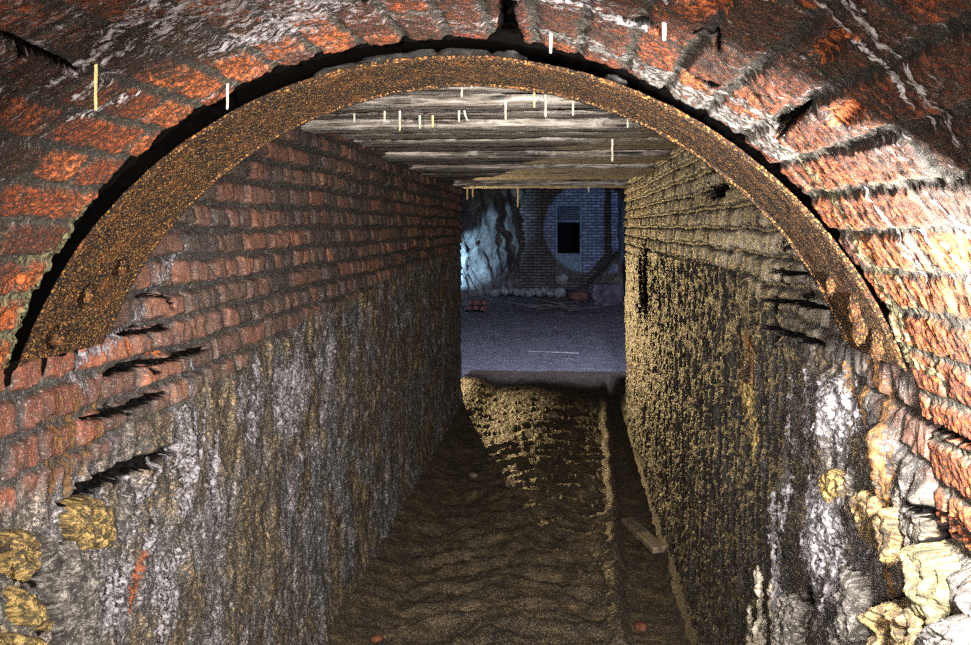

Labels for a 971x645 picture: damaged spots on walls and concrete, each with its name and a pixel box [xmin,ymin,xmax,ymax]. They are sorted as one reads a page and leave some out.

crack [0,30,103,72]
leakage [923,191,971,239]
leakage [918,229,971,281]
leakage [767,580,778,645]